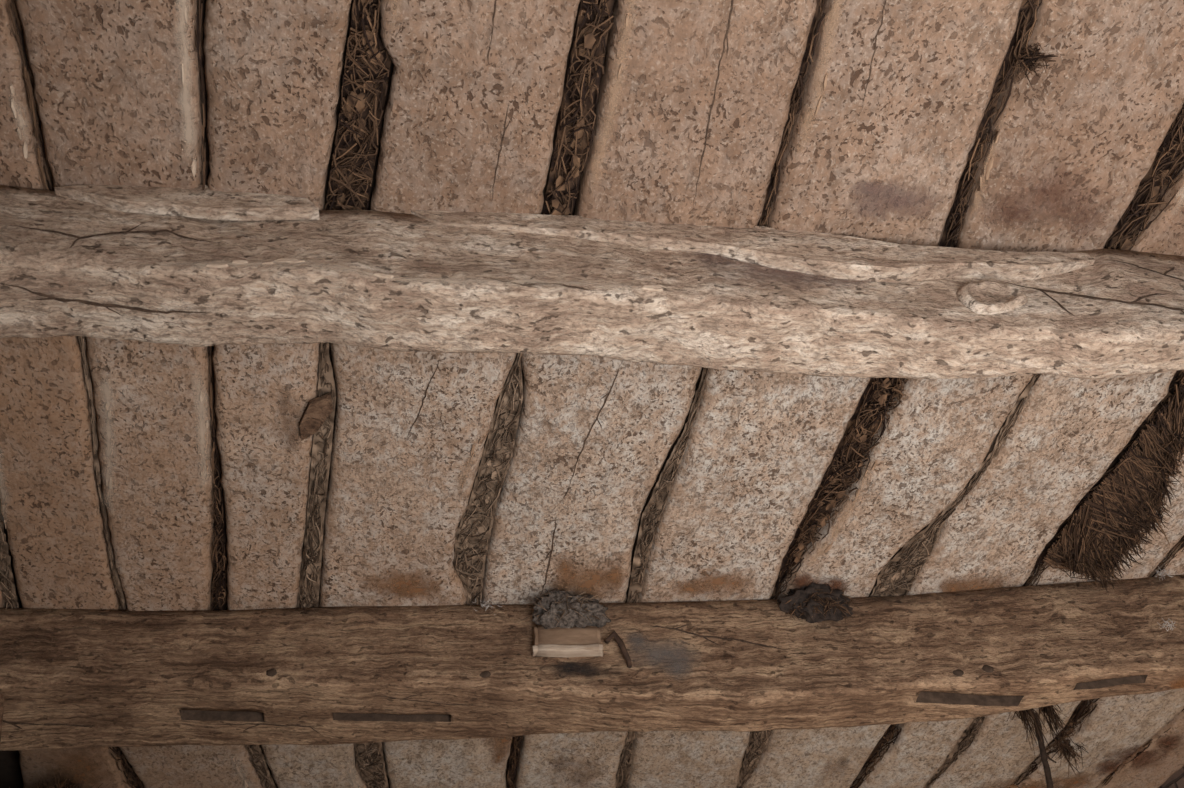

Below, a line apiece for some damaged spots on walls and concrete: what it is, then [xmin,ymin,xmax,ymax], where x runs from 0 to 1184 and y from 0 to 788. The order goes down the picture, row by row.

crack [10,224,218,248]
crack [1001,260,1184,316]